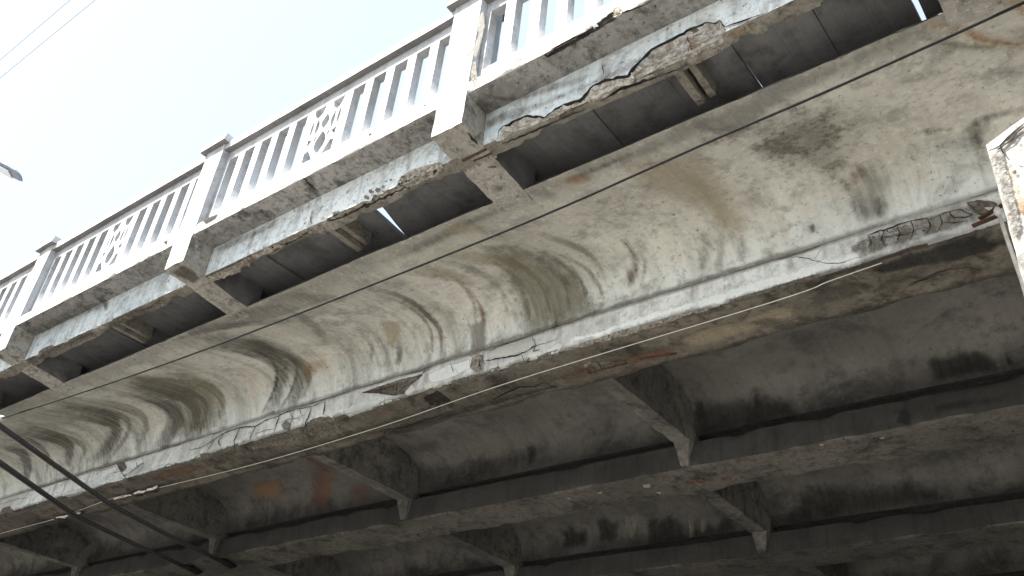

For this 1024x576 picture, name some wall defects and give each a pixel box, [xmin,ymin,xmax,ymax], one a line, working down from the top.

spalling [498,6,767,144]
damp [758,116,840,155]
crack [799,209,973,264]
peeling [0,125,1024,518]
damp [33,430,73,458]
damp [88,410,120,450]
damp [137,377,224,437]
crack [191,402,325,452]
damp [233,341,311,395]
crack [370,336,555,435]
damp [931,353,992,378]